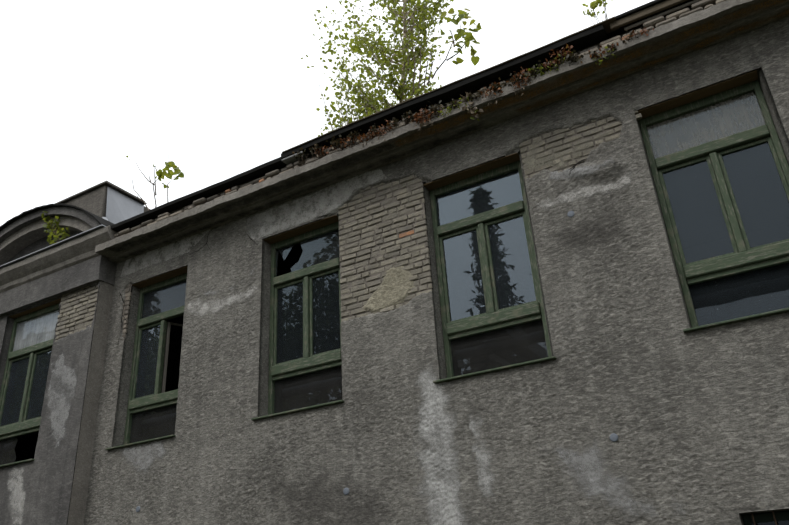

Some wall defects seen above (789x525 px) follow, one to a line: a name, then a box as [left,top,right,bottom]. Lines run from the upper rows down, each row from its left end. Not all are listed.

flaking render [55,283,100,342]
flaking render [247,169,433,322]
leakage [419,372,462,525]
leakage [474,448,492,495]